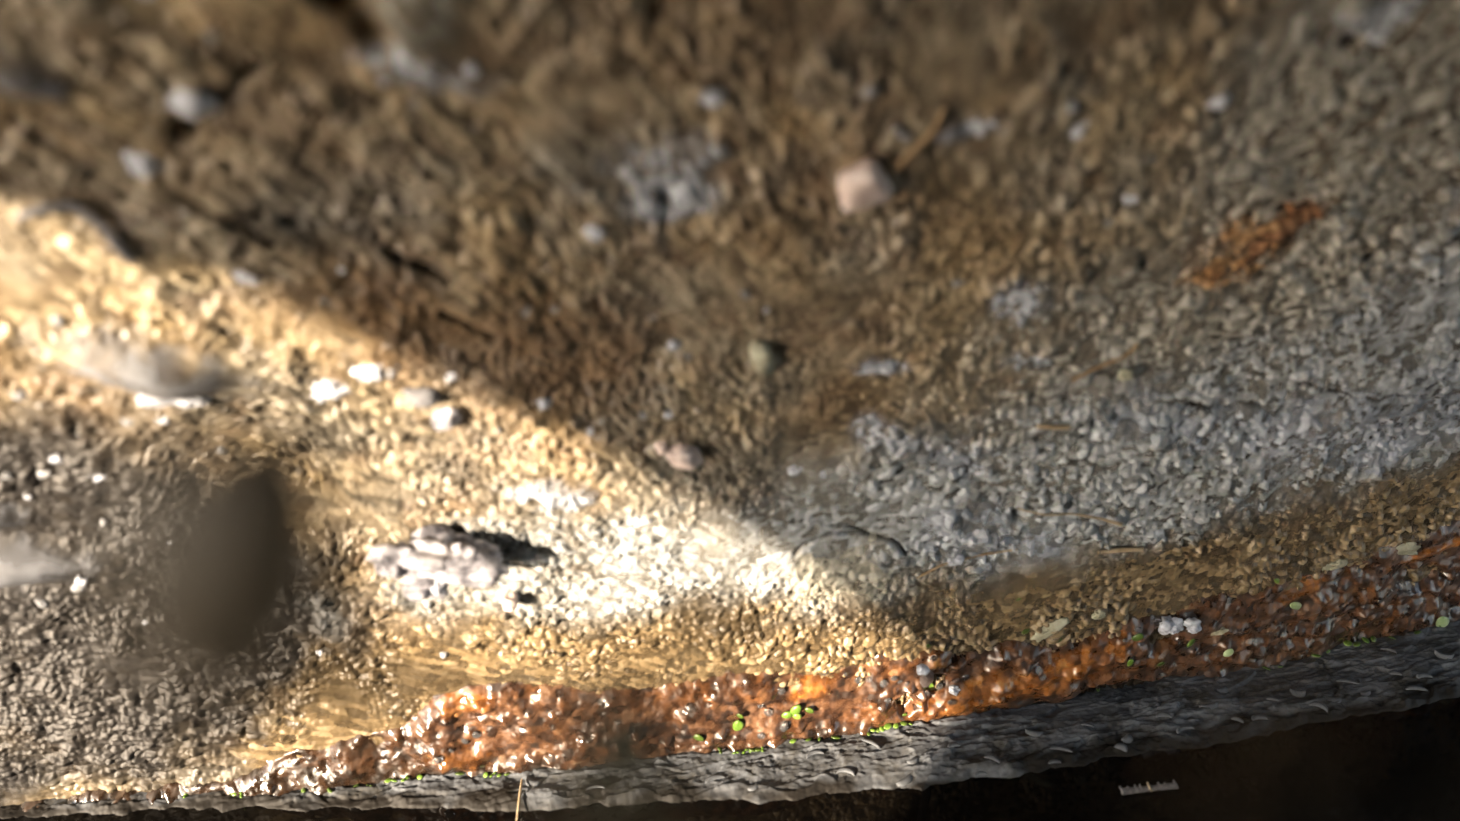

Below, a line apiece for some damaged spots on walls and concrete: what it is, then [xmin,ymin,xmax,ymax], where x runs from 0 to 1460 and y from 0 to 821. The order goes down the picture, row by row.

corrosion [1179,197,1324,289]
corrosion [663,520,1460,754]
corrosion [67,680,570,805]